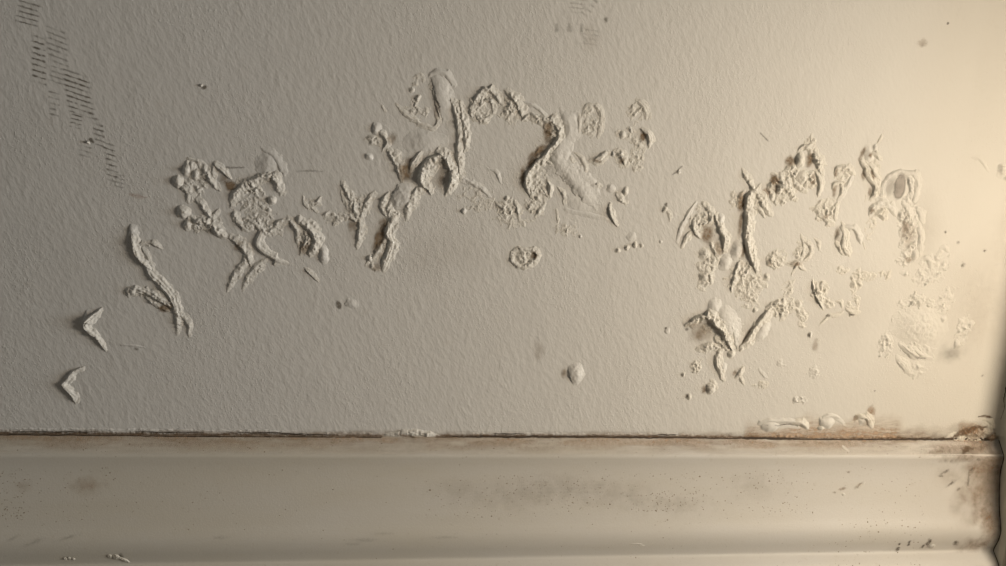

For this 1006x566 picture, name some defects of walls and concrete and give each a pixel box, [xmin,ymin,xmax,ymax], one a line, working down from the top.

crack [0,430,382,438]
crack [436,387,1006,566]